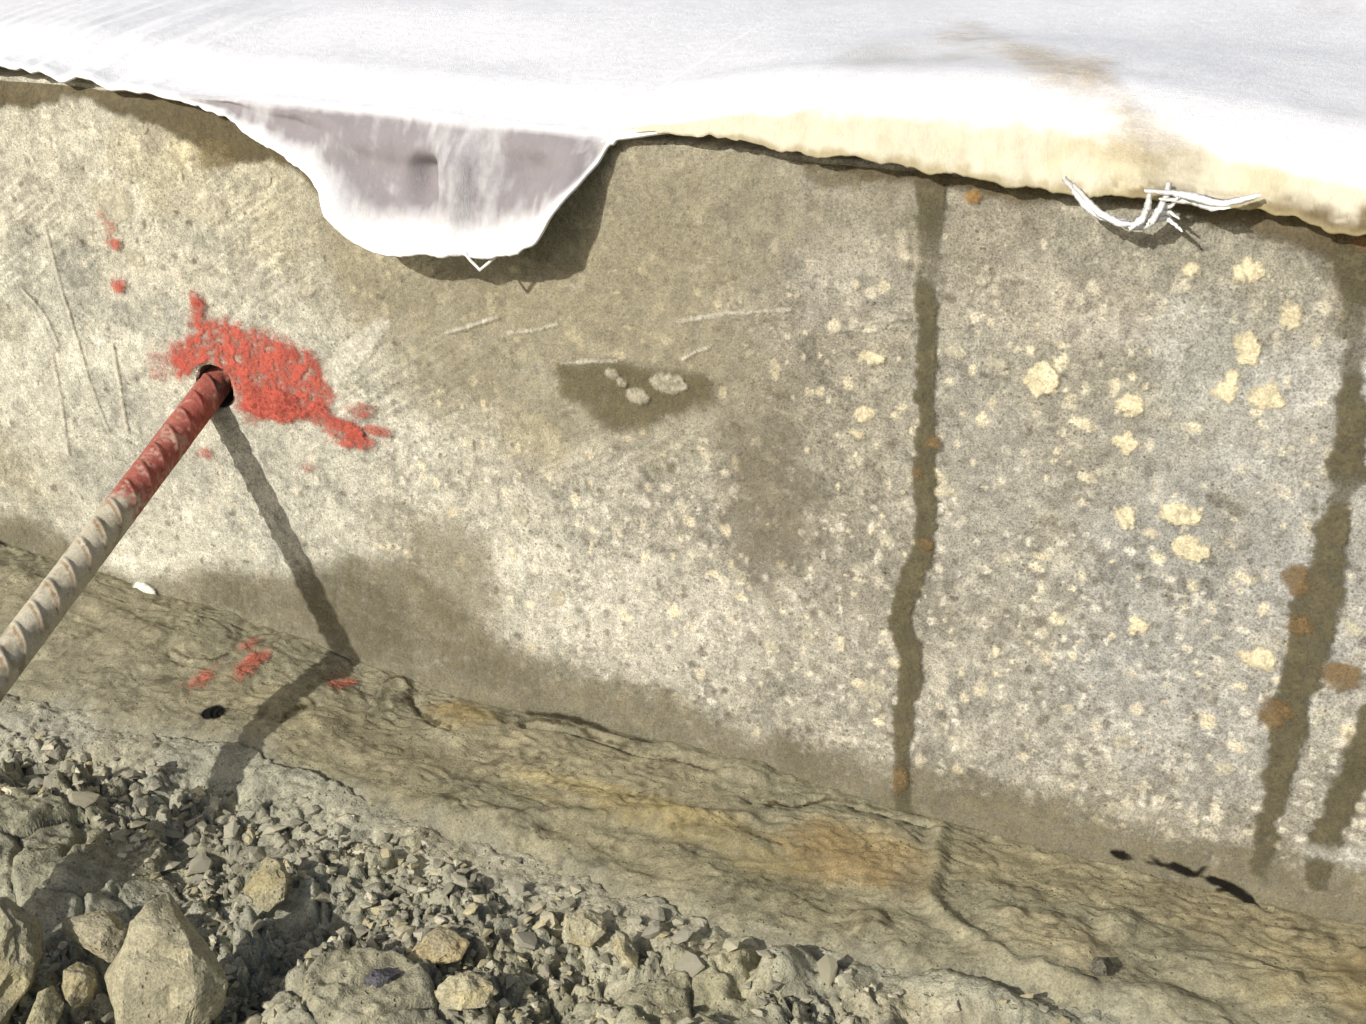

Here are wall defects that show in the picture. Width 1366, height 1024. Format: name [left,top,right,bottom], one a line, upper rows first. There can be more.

water stain [151,156,1366,926]
crack [1110,850,1258,906]